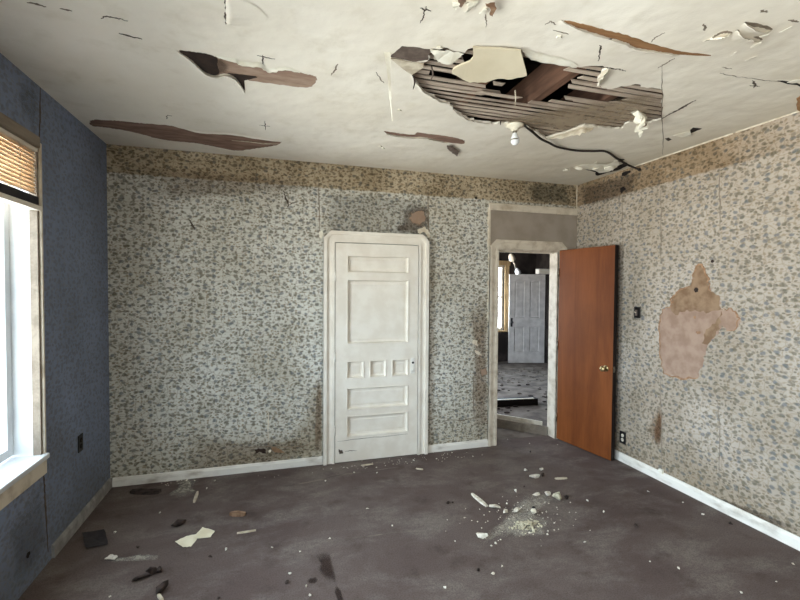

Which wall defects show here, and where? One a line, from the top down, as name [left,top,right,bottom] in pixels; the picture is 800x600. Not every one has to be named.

peeling [452,0,497,17]
peeling [702,19,799,61]
peeling [177,50,317,95]
crack [545,20,779,154]
peeling [89,120,283,151]
peeling [384,131,465,156]
peeling [631,110,648,137]
flaking render [658,260,741,380]